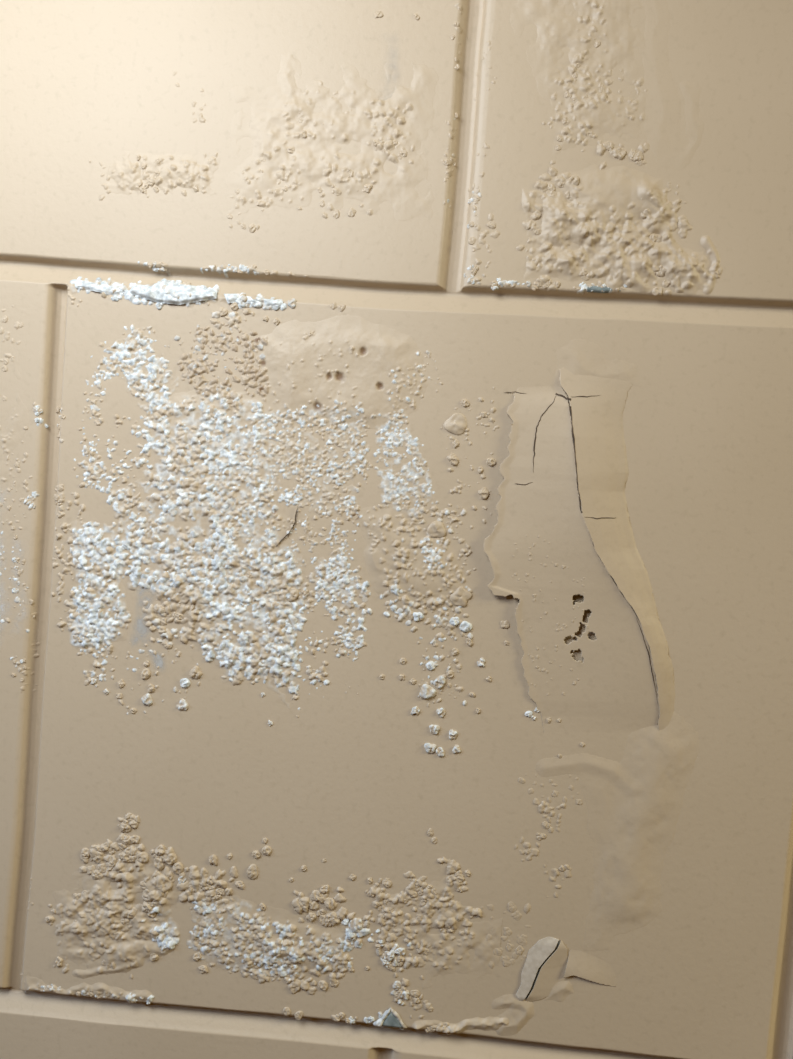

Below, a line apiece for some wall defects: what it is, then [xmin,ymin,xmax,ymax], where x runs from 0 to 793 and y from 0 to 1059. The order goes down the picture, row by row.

efflorescence [50,276,500,757]
peeling [483,367,675,747]
peeling [331,937,617,1036]